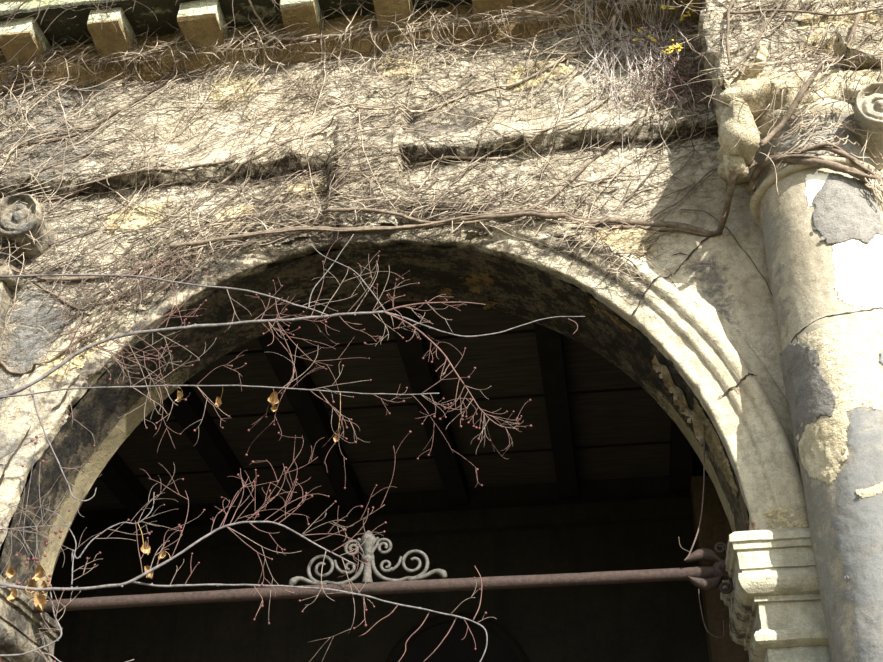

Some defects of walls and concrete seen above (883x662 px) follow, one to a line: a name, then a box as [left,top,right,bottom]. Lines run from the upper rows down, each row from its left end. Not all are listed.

peeling [812,171,883,245]
crack [790,307,883,343]
crack [718,373,758,398]
spalling [652,355,738,497]
peeling [780,311,883,662]